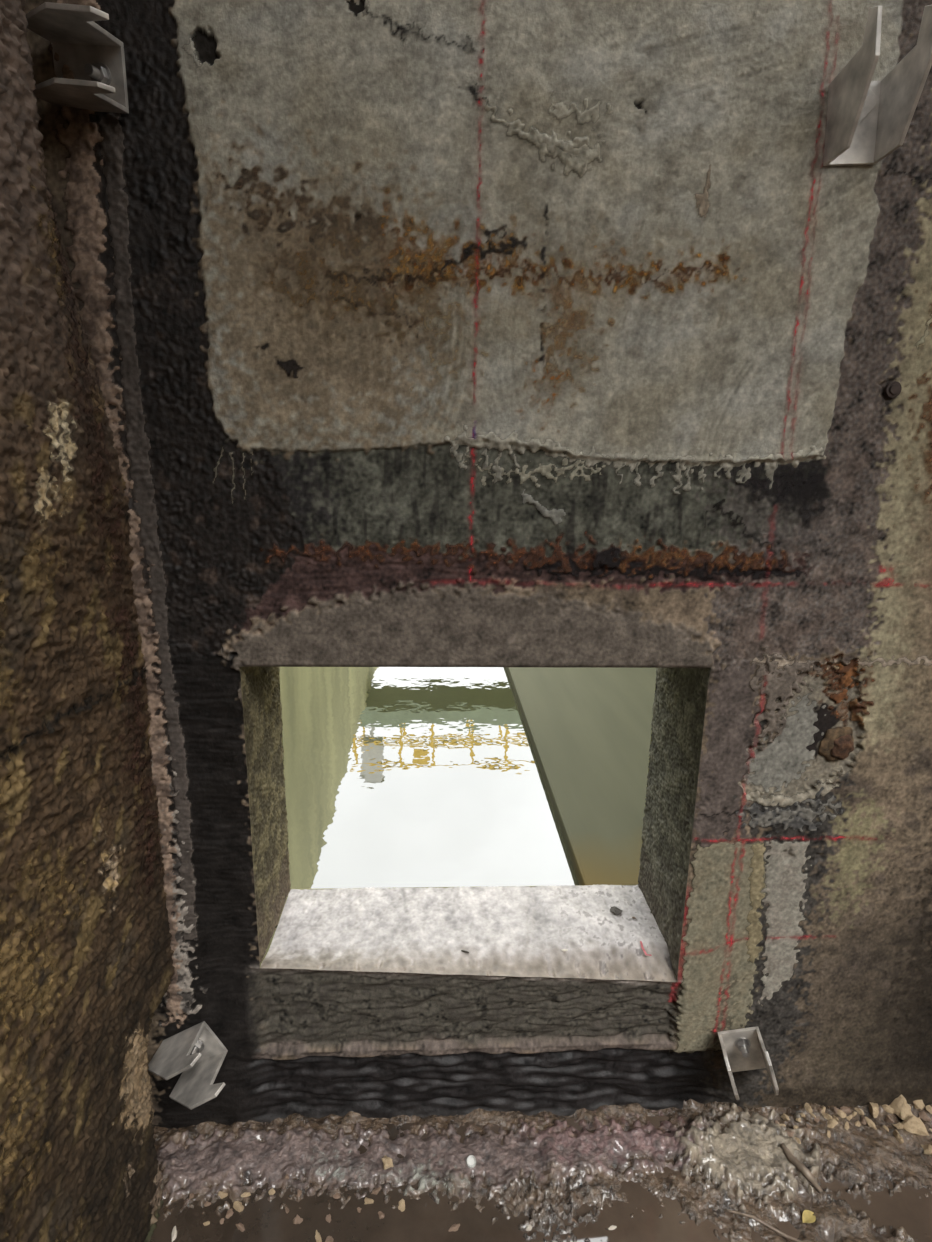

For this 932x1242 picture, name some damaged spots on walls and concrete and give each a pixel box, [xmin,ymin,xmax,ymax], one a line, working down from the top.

corrosion [216,168,736,412]
corrosion [261,531,805,582]
spalling [735,647,874,963]
corrosion [807,654,875,721]